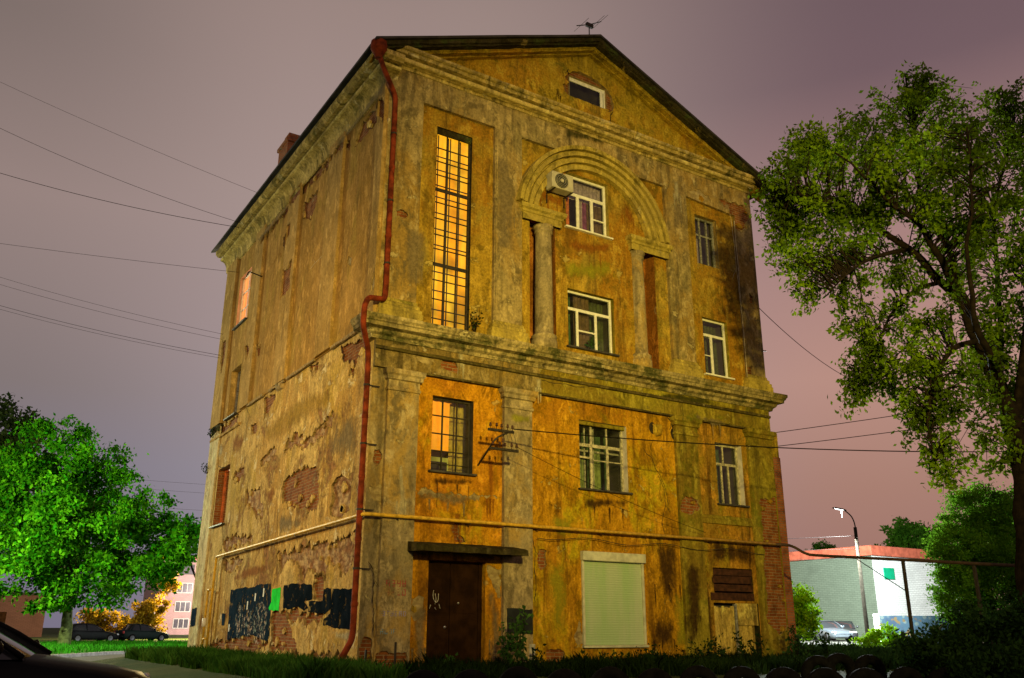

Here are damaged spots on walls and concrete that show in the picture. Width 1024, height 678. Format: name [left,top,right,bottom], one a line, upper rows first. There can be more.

flaking render [260,97,390,296]
flaking render [341,338,365,377]
flaking render [260,410,334,467]
flaking render [282,464,352,518]
flaking render [209,528,408,668]
damp [654,545,713,648]
damp [714,541,752,562]
flaking render [759,496,788,635]